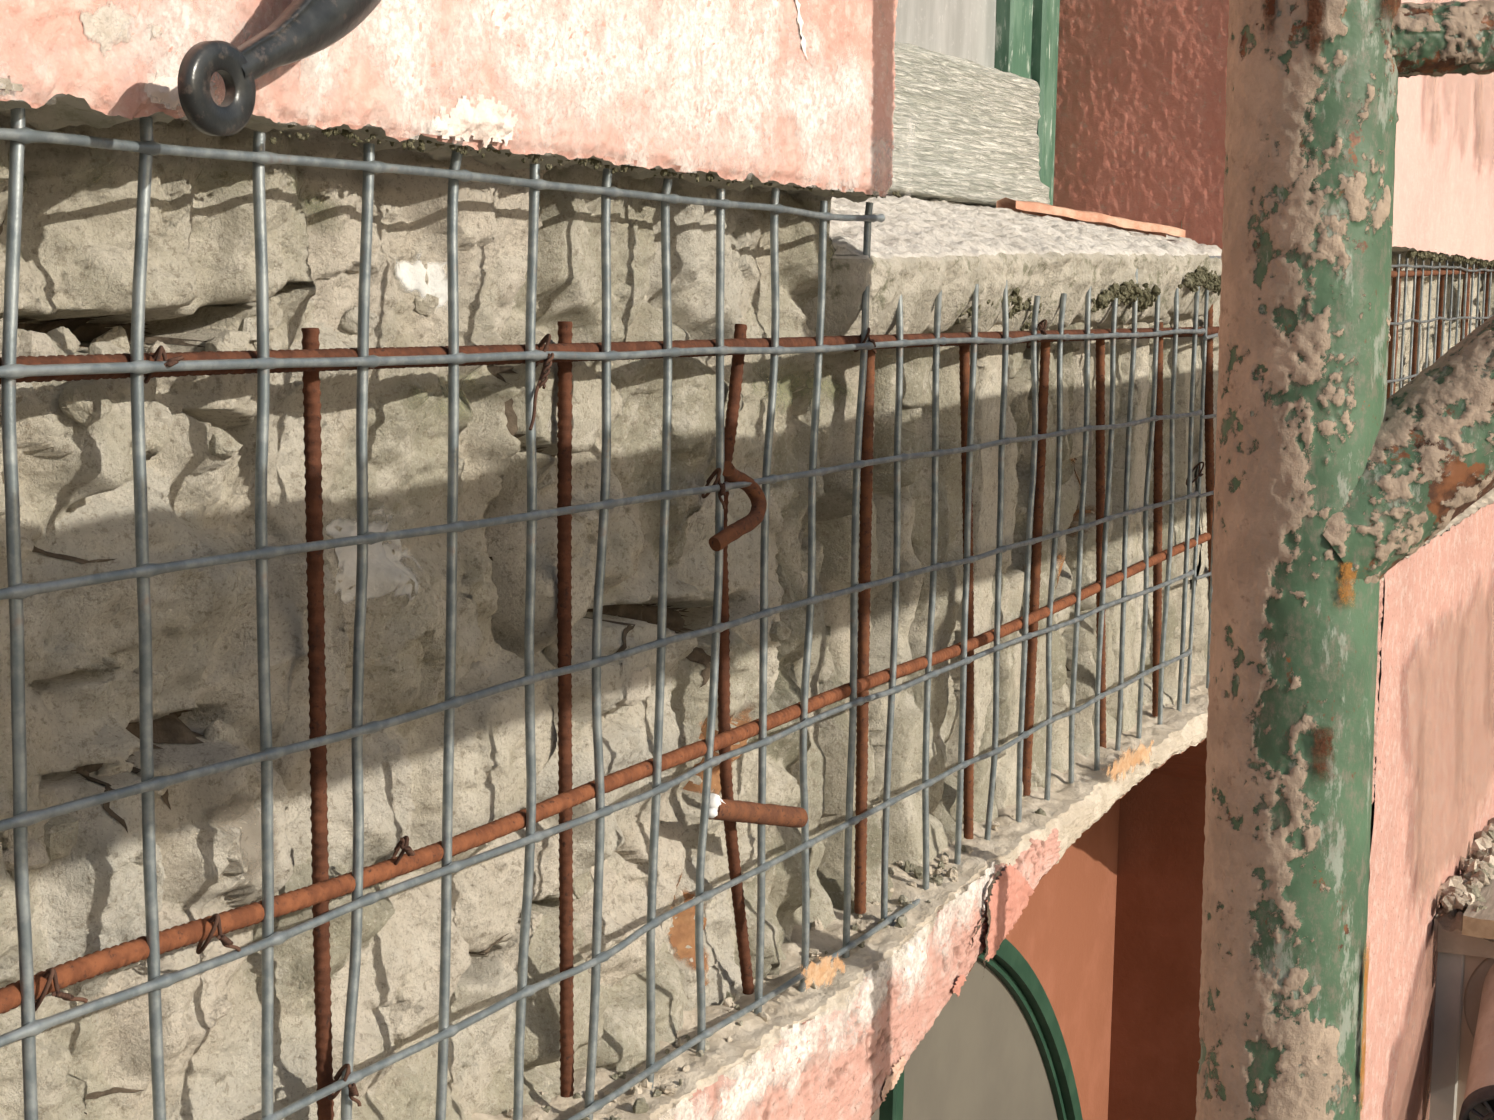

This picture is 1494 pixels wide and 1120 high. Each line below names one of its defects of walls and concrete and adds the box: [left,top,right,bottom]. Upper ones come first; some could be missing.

corrosion [1263,0,1275,30]
corrosion [1307,0,1325,54]
corrosion [1382,0,1399,18]
spalling [0,75,24,94]
crack [17,315,207,348]
spalling [1386,251,1494,400]
spalling [0,114,1220,1120]
corrosion [683,709,752,795]
corrosion [668,875,710,986]